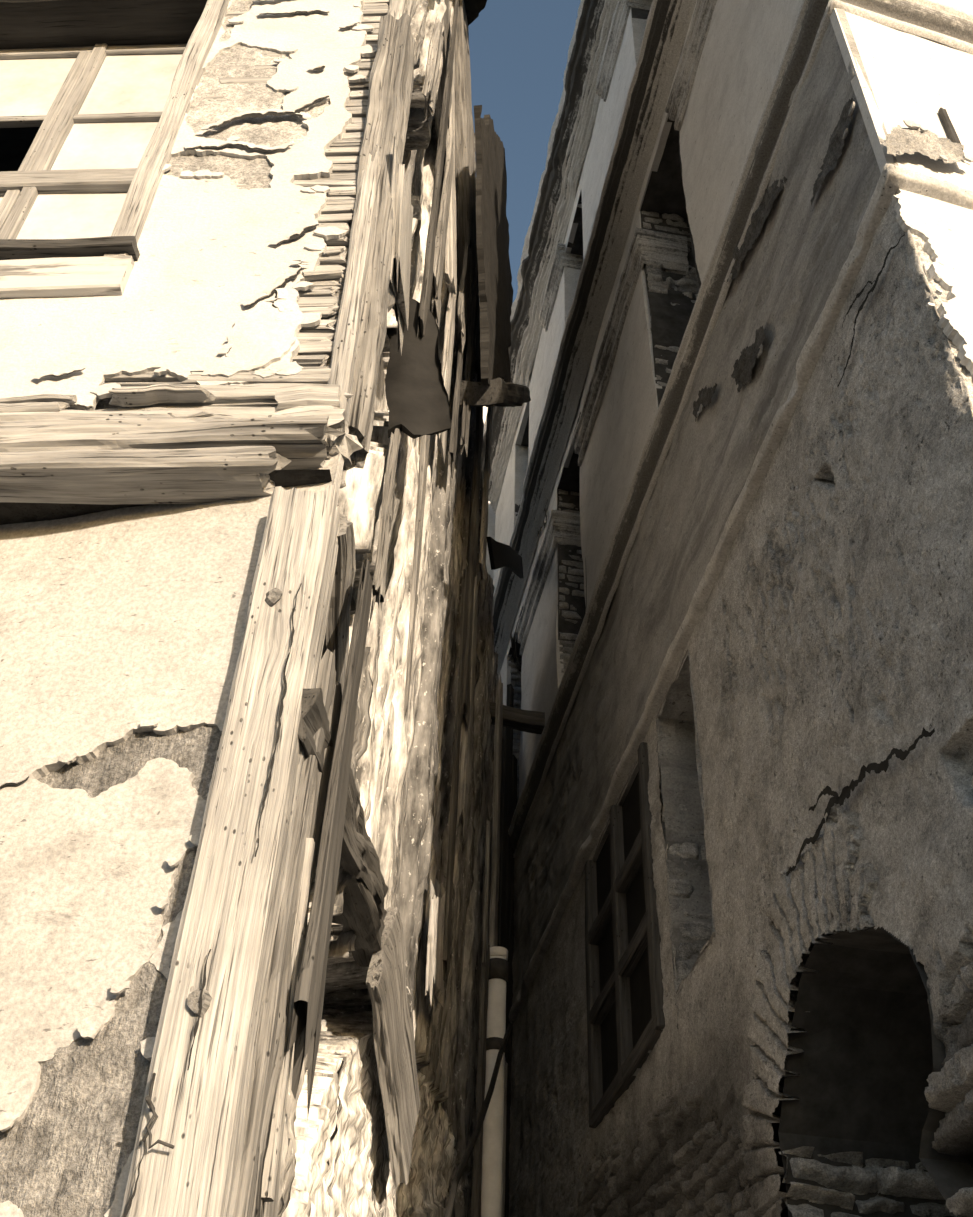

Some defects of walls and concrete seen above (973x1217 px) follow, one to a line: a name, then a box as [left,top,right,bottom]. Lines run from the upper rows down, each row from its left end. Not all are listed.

spalling [344,24,377,83]
peeling [162,0,330,190]
spalling [300,185,330,194]
spalling [304,226,349,251]
spalling [291,281,314,291]
spalling [301,313,322,327]
spalling [926,275,943,309]
spalling [731,325,766,392]
spalling [693,383,717,421]
spalling [37,717,222,801]
crack [786,727,935,876]
spalling [0,826,202,1217]